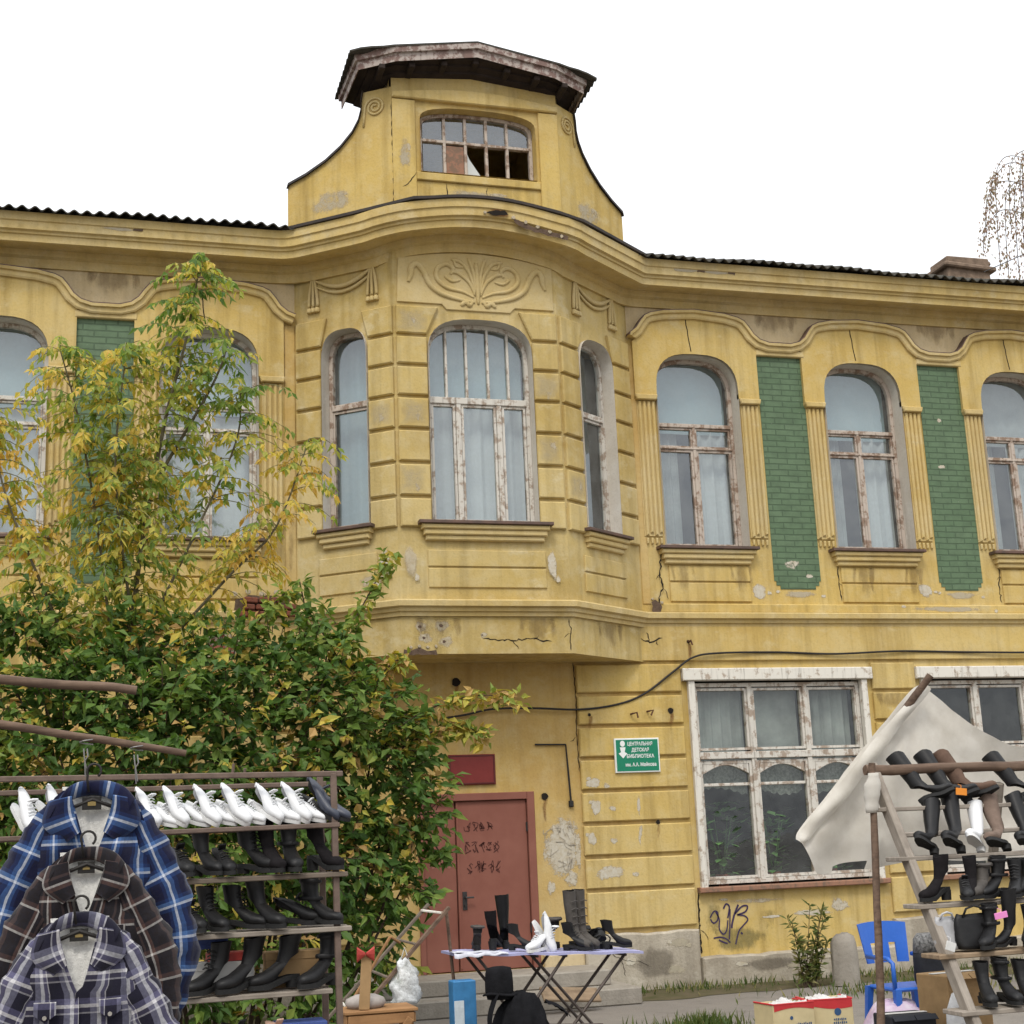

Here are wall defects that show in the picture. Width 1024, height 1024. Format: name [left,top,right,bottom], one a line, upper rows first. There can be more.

spalling [511,216,568,240]
peeling [548,553,561,582]
crack [656,554,669,603]
peeling [753,584,826,599]
spalling [404,622,452,655]
crack [483,621,580,768]
peeling [586,777,609,788]
peeling [543,818,596,893]
peeling [597,866,639,880]